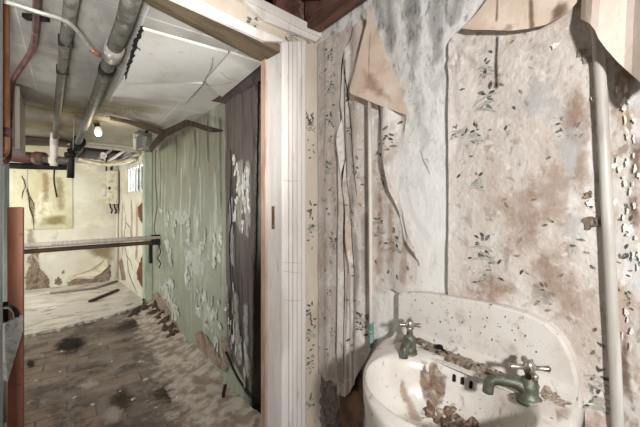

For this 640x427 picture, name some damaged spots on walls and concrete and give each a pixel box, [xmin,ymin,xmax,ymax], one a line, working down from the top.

peeling [616,85,636,124]
peeling [232,154,250,233]
peeling [612,152,640,195]
peeling [622,202,638,240]
flaking render [24,248,111,290]
flaking render [157,208,247,372]
water stain [56,337,84,353]
flaking render [319,377,339,427]